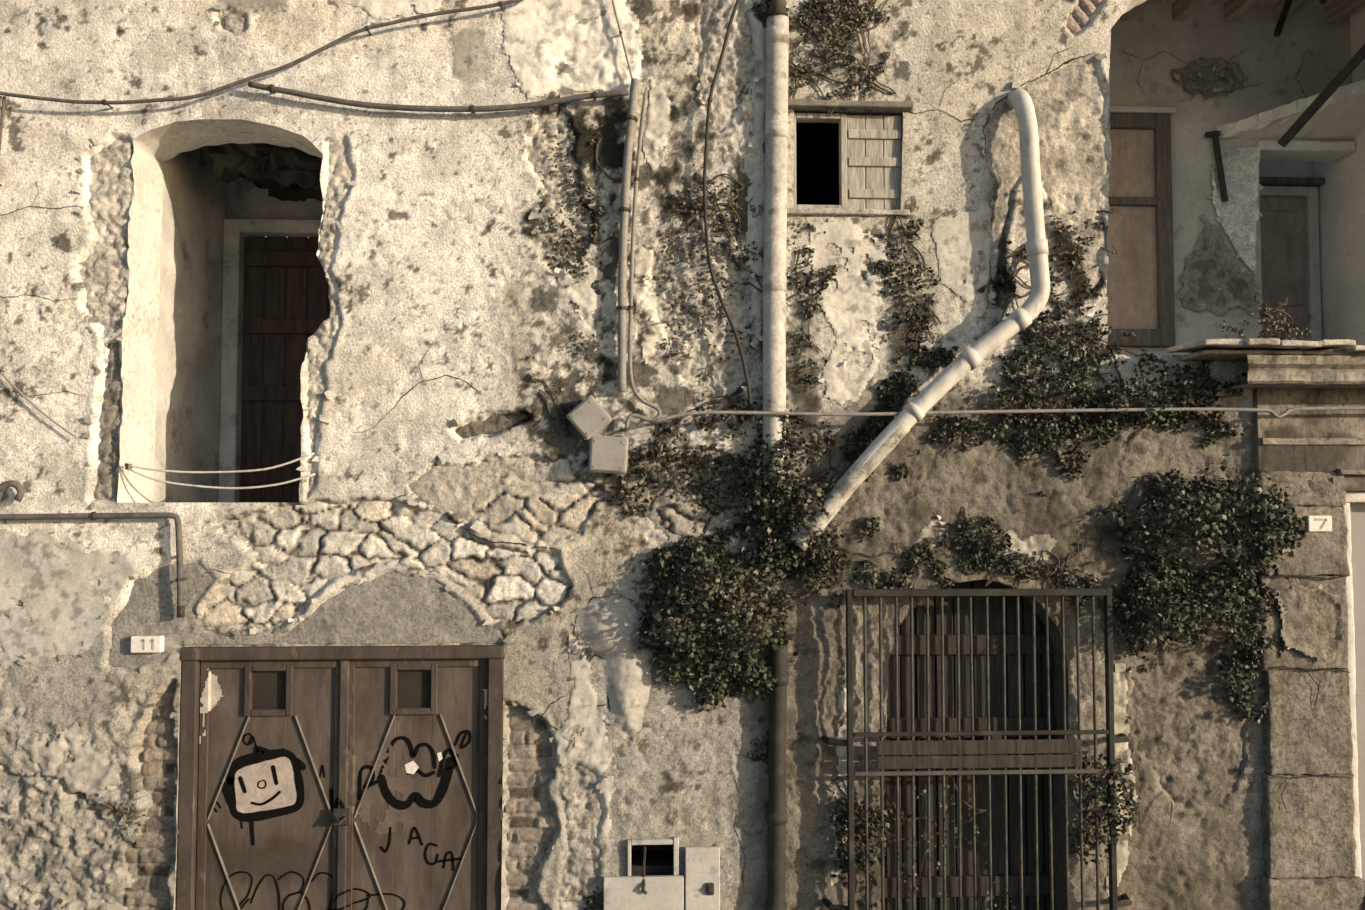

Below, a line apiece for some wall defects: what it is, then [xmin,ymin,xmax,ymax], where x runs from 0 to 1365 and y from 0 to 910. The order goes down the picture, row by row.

peeling [457,521,483,532]
flaking render [0,529,512,674]
peeling [16,722,123,800]
peeling [548,634,616,860]